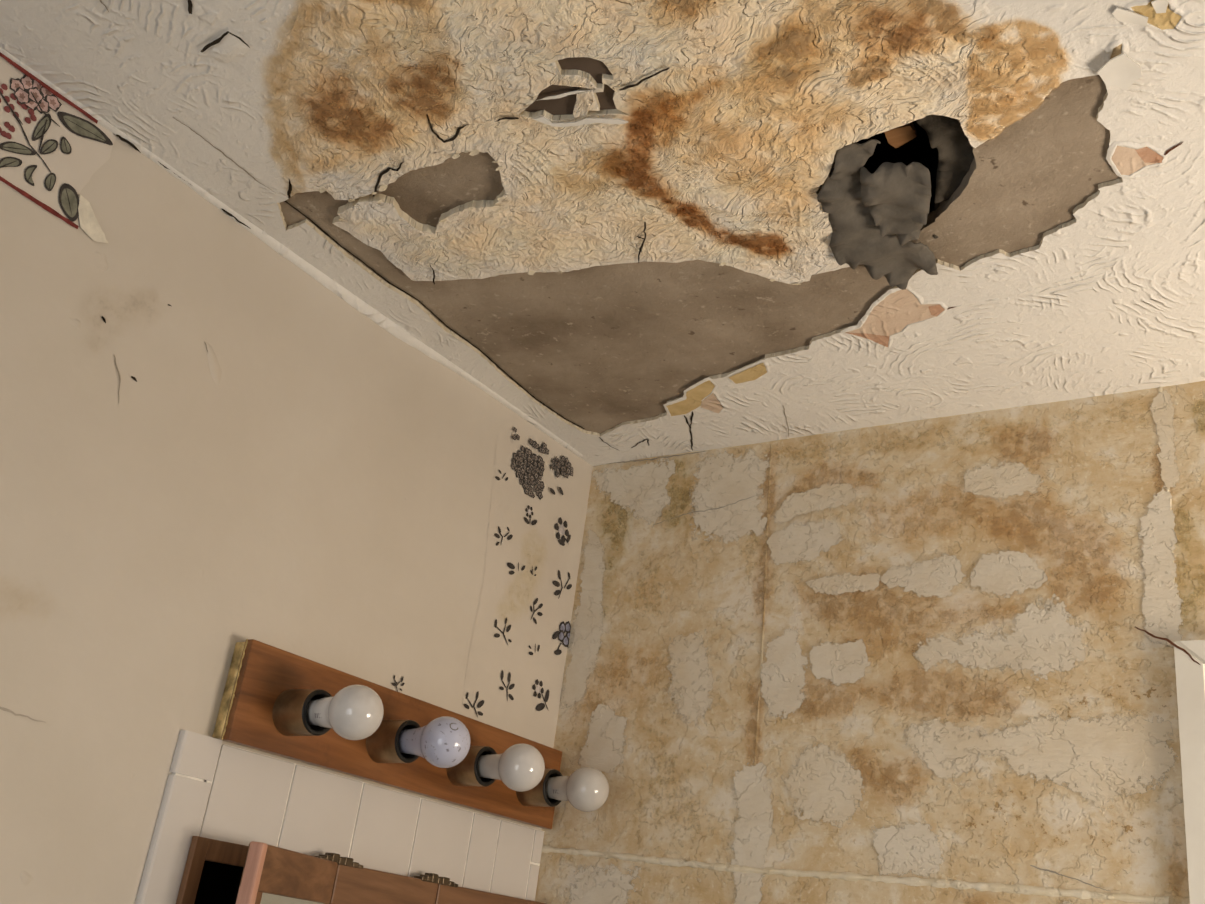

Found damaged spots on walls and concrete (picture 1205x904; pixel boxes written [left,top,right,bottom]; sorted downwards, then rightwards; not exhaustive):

peeling [1112,0,1186,33]
flaking render [518,57,629,127]
damp [852,60,890,86]
flaking render [854,38,1168,271]
crack [637,222,646,263]
flaking render [277,150,948,436]
crack [1135,626,1200,665]